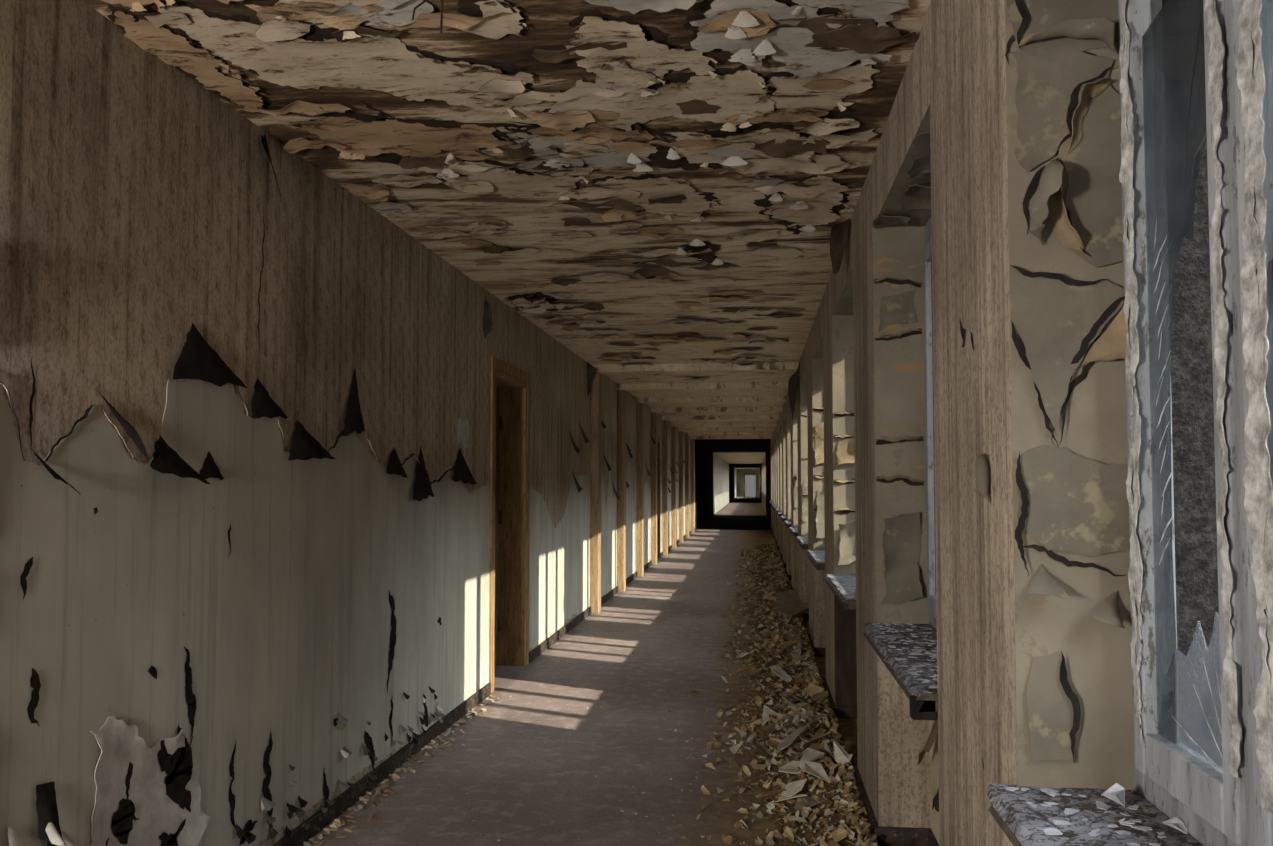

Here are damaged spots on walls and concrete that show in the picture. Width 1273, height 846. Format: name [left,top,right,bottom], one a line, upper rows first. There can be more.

crack [1005,34,1016,65]
peeling [871,132,931,229]
peeling [483,279,805,381]
peeling [1006,0,1146,763]
crack [1051,329,1103,446]
flaking render [384,686,445,748]
flaking render [7,781,76,846]
flaking render [90,715,210,846]
flaking render [236,743,378,846]